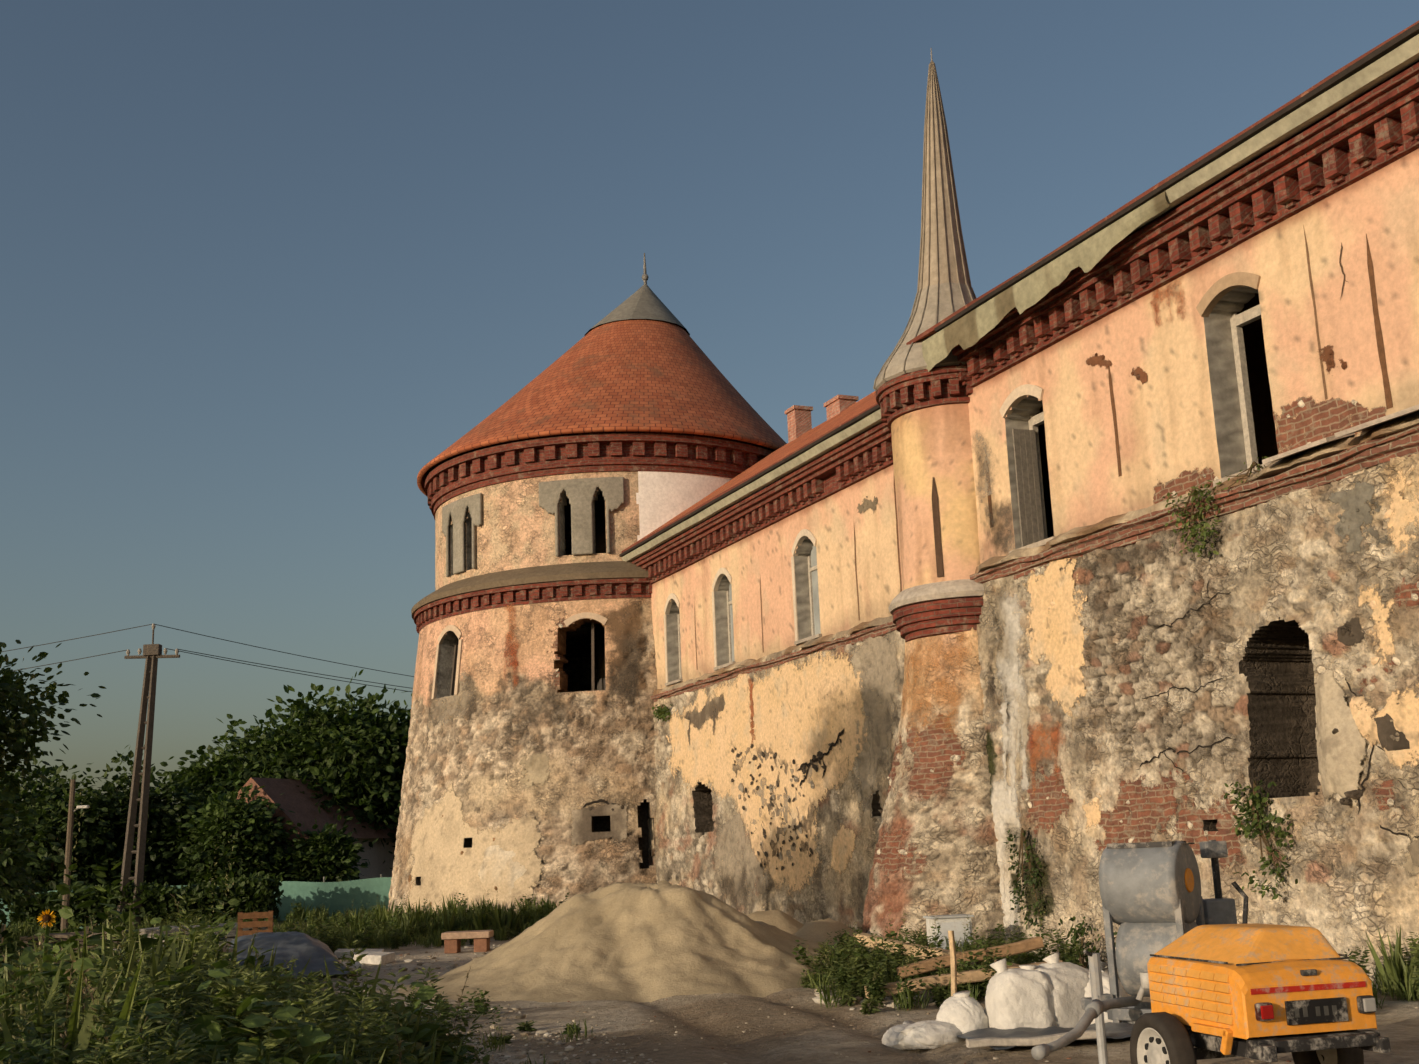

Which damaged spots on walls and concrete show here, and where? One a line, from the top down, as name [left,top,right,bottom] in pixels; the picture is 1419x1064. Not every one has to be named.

spalling [1272,397,1386,454]
spalling [1153,468,1218,504]
peeling [1328,467,1419,886]
peeling [406,781,550,914]
spalling [571,803,628,846]
peeling [666,650,868,898]
spalling [873,823,927,884]
spalling [883,713,965,806]
spalling [1021,759,1243,874]